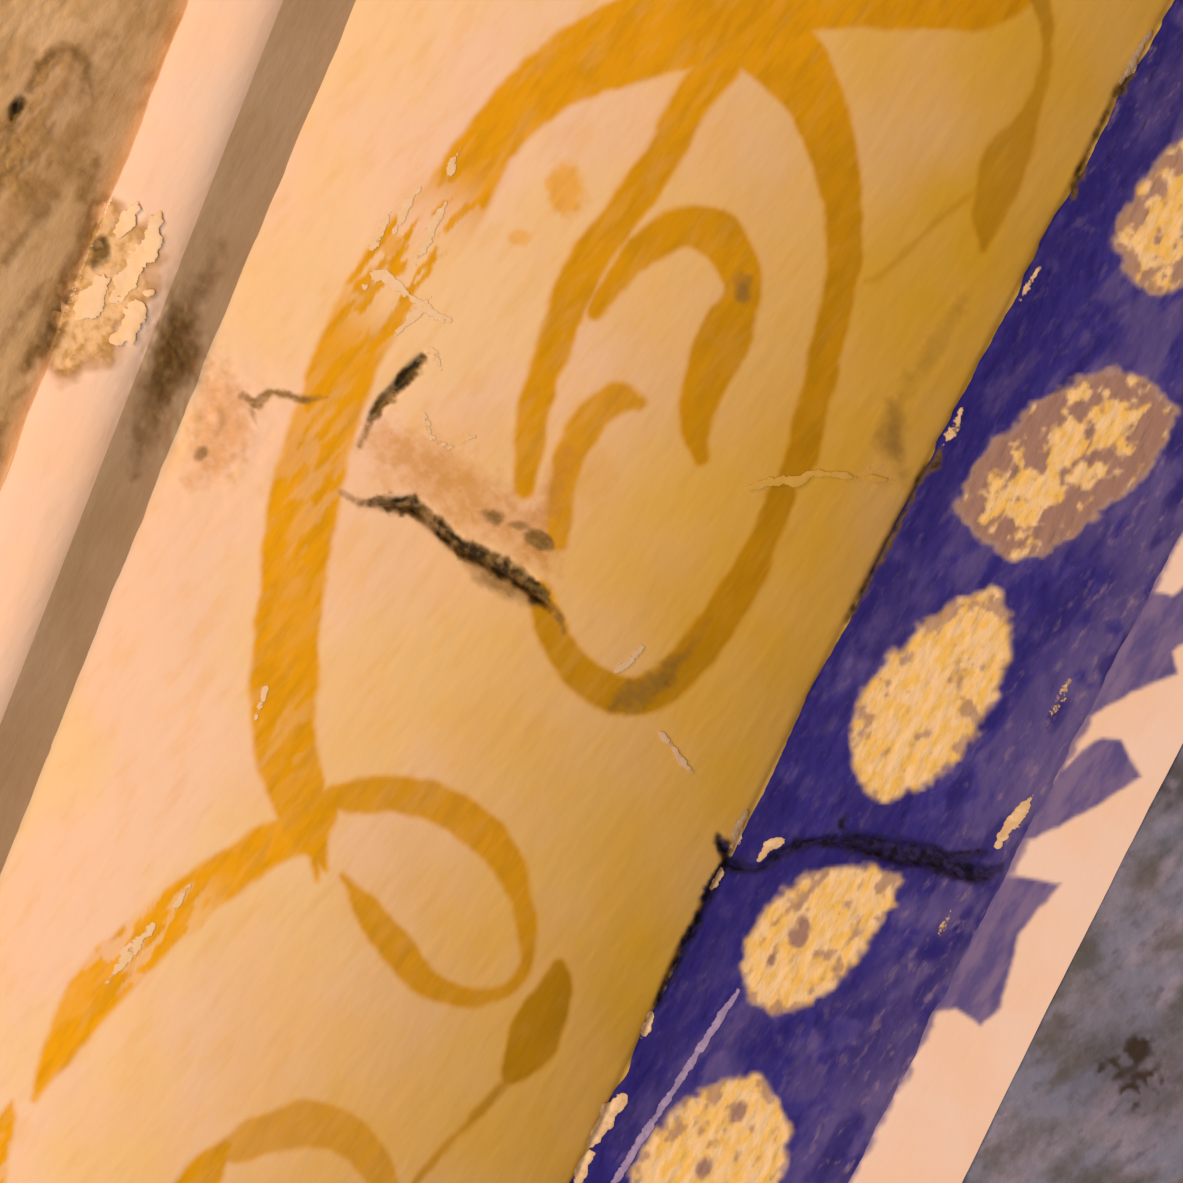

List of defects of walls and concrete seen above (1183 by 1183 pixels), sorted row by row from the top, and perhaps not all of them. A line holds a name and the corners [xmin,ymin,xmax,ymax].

spalling [22,197,164,376]
damp [151,308,197,401]
crack [359,354,426,447]
crack [367,495,562,621]
crack [655,809,1002,1006]